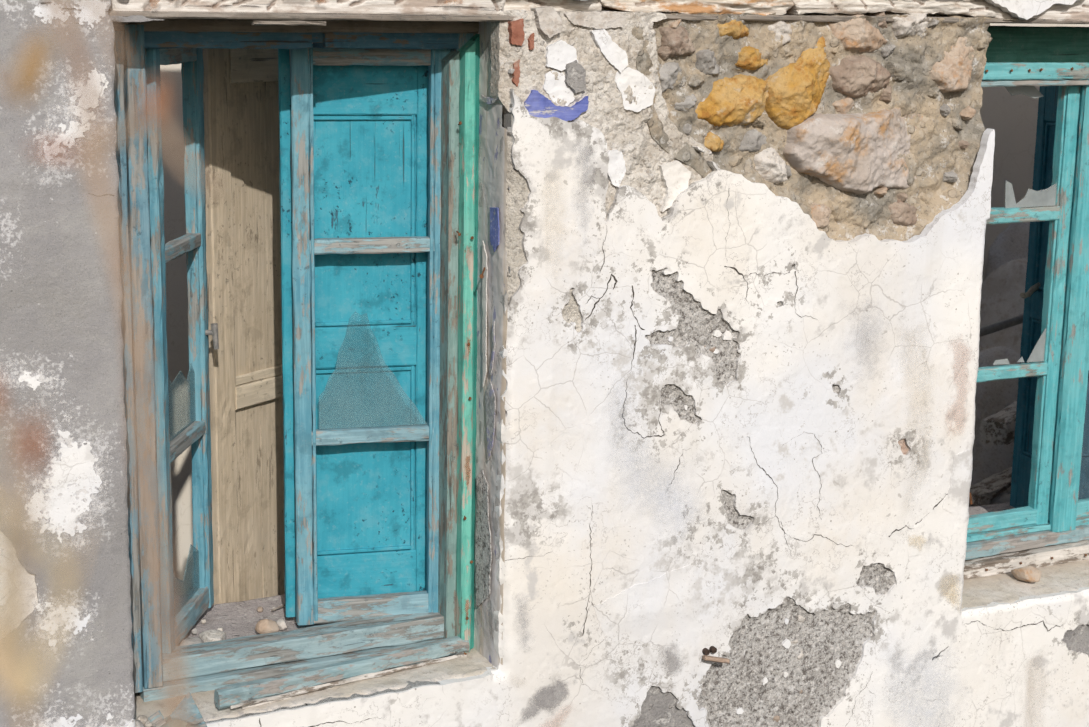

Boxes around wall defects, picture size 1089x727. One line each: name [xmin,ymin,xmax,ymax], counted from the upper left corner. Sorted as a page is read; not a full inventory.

peeling [32,3,57,24]
peeling [44,62,84,148]
flaking render [490,6,1018,241]
crack [724,196,815,319]
crack [582,218,691,492]
spalling [661,384,701,424]
spalling [645,268,739,385]
peeling [20,409,108,553]
crack [747,432,850,550]
spalling [856,563,895,595]
spalling [632,597,875,727]
spalling [1062,624,1089,657]